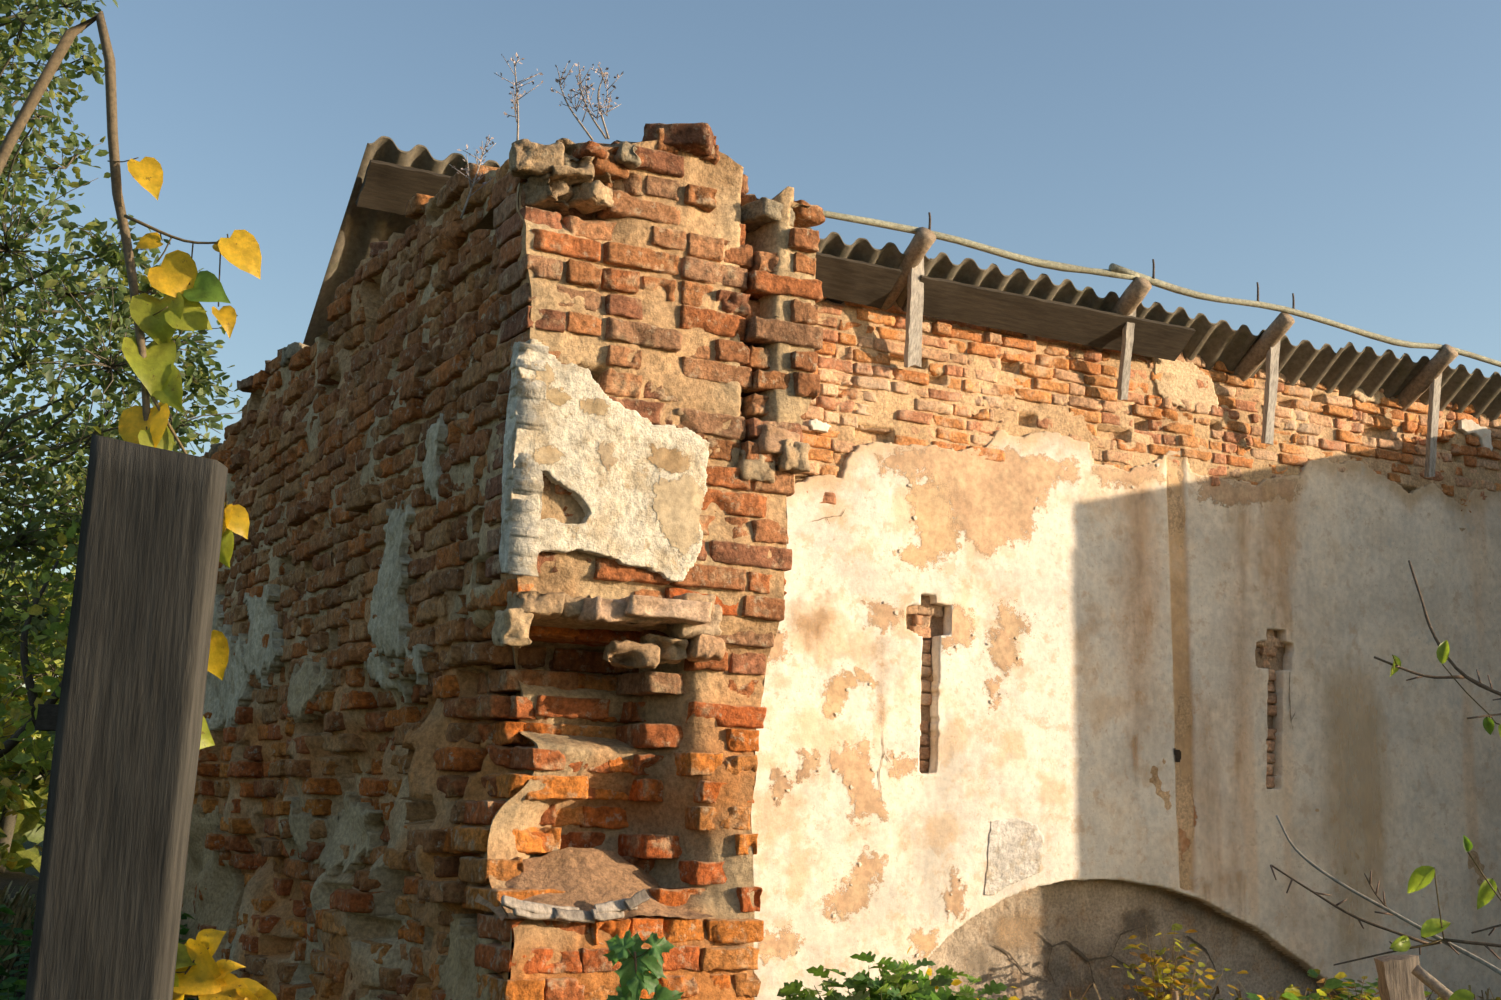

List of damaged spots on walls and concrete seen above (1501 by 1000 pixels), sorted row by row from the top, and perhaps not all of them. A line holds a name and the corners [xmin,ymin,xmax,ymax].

spalling [532,362,610,416]
spalling [533,444,565,465]
spalling [597,440,618,474]
spalling [647,443,704,557]